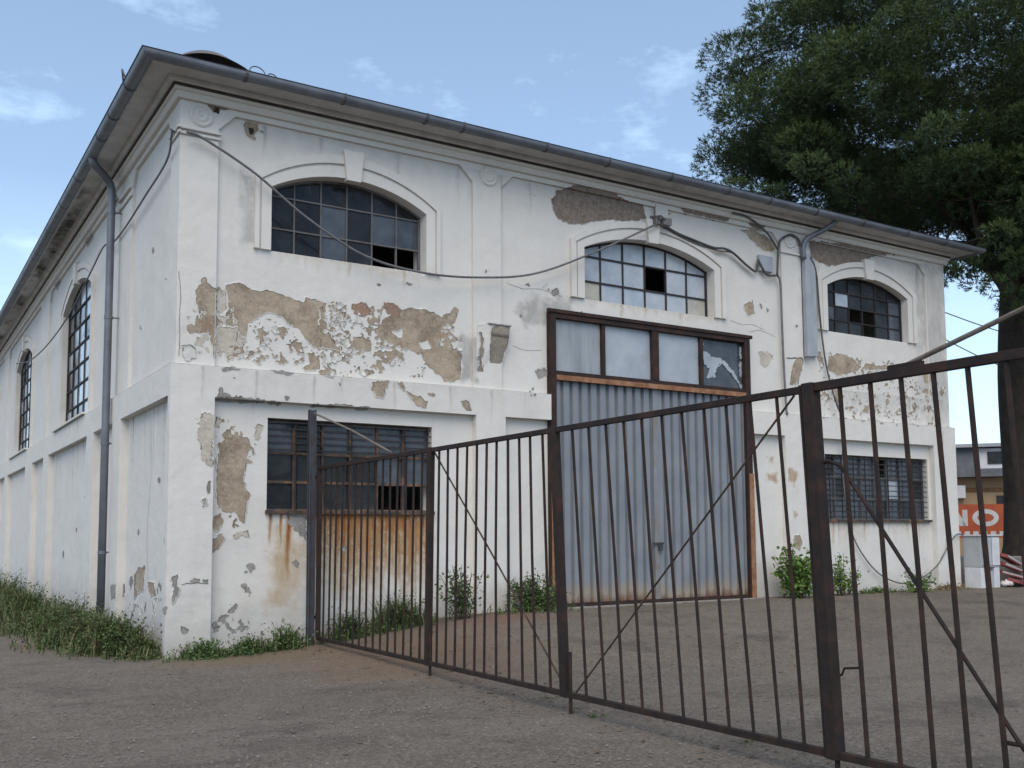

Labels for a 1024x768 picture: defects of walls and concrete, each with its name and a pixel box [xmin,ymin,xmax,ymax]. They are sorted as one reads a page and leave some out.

flaking render [550,185,646,225]
flaking render [740,224,776,253]
flaking render [808,240,904,267]
peeling [186,277,463,408]
peeling [817,351,948,427]
peeling [195,387,290,553]
corrosion [269,514,291,563]
corrosion [315,514,426,580]
peeling [110,564,208,634]
peeling [212,603,290,635]